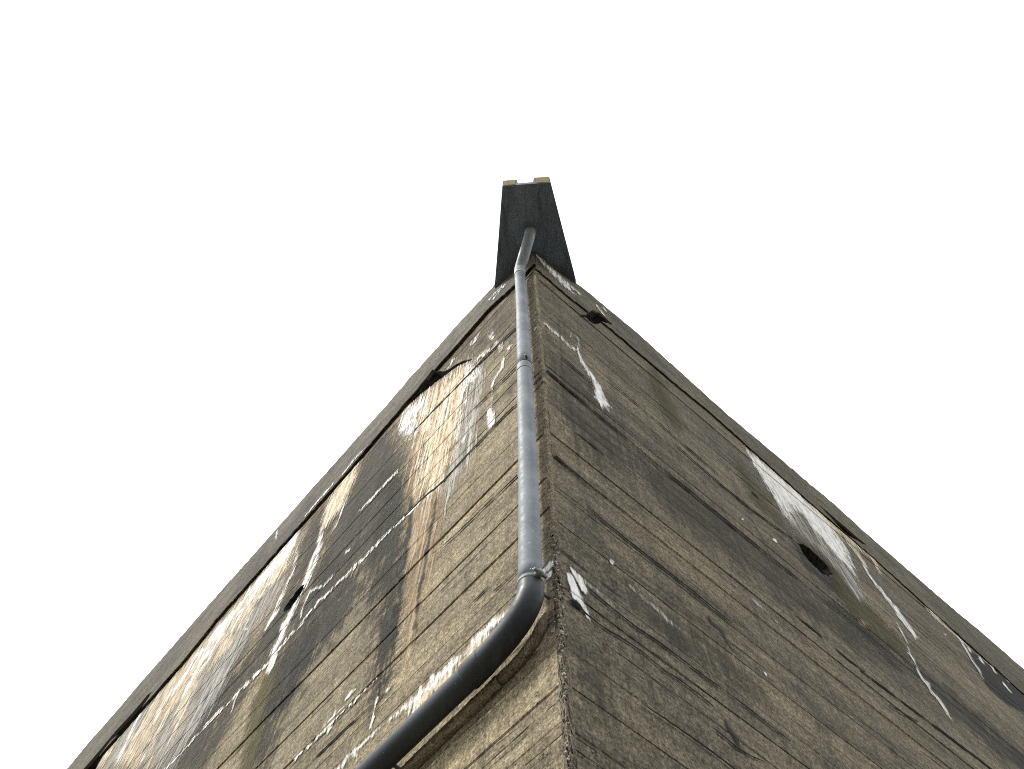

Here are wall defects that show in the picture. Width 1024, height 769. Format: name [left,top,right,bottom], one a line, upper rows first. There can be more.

spalling [403,359,472,410]
leakage [467,284,512,390]
leakage [487,408,495,428]
leakage [534,323,628,458]
spalling [580,312,607,324]
leakage [97,428,505,769]
leakage [567,567,598,620]
leakage [652,450,1024,769]